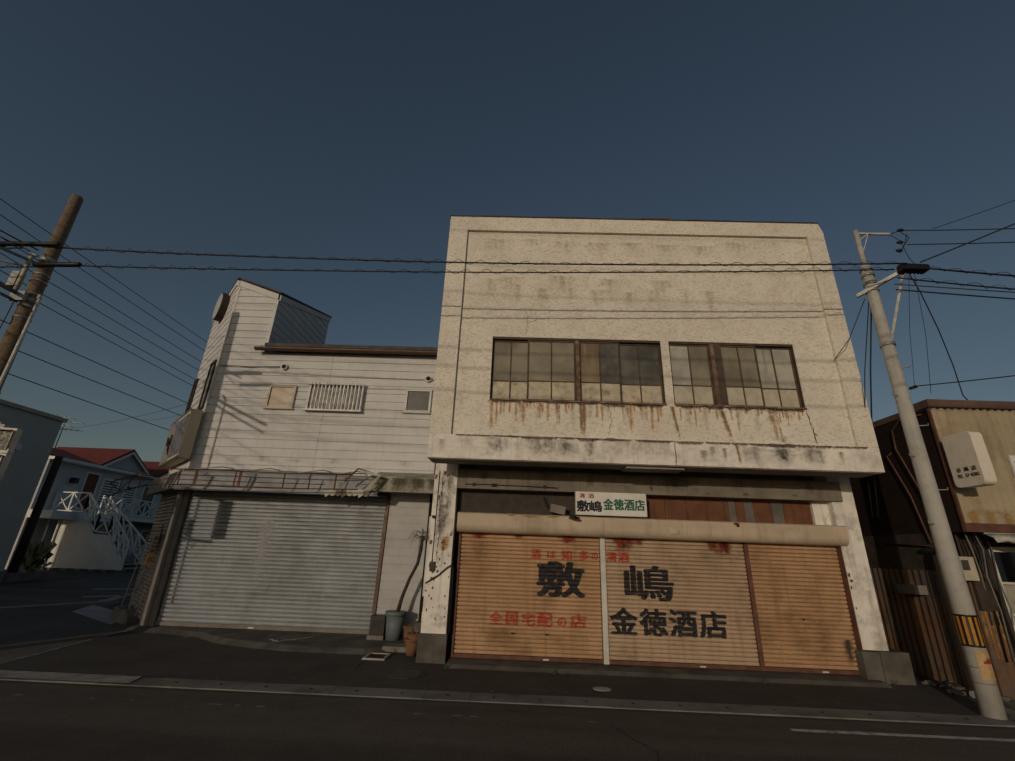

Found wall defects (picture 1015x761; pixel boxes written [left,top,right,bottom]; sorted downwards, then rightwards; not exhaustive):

corrosion [490,401,615,430]
corrosion [627,406,803,435]